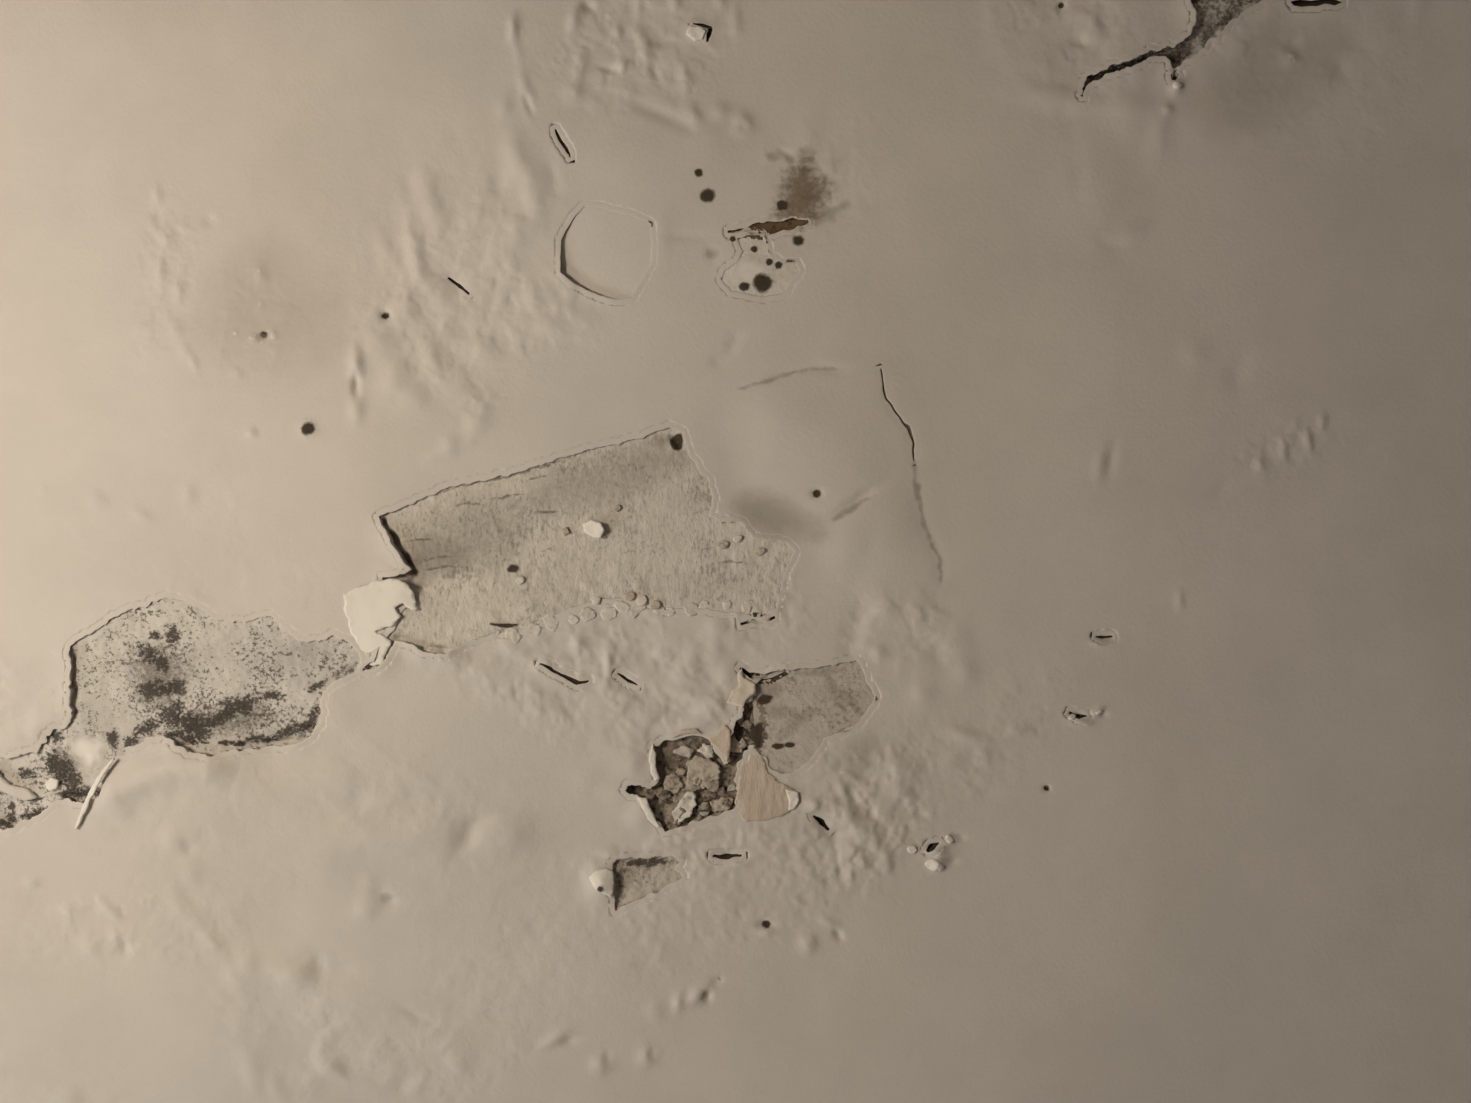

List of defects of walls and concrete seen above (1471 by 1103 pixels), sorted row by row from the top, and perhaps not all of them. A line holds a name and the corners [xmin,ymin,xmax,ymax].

peeling [1075,0,1277,102]
damp [695,169,714,202]
crack [875,365,921,465]
peeling [0,421,801,836]
flaking render [589,654,880,918]